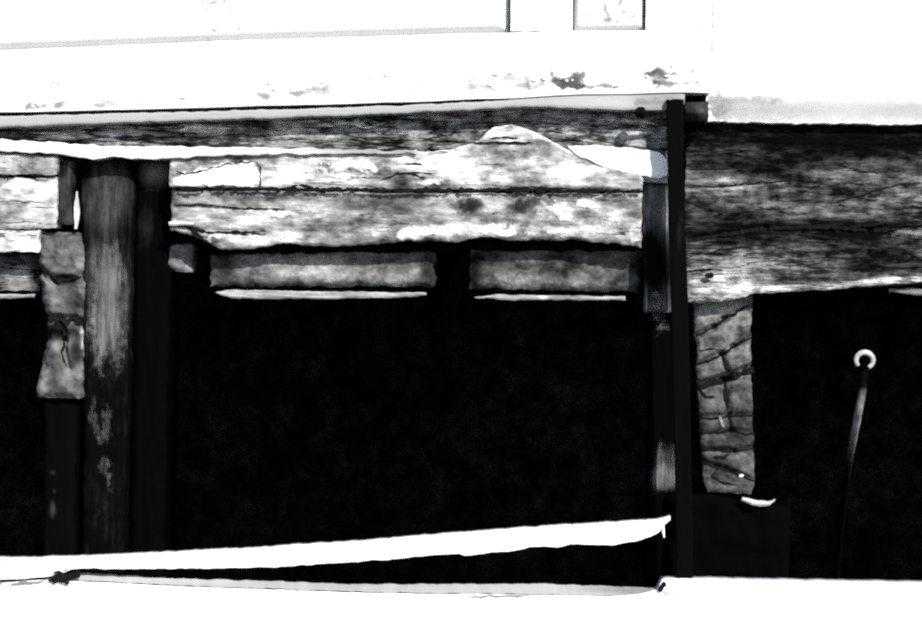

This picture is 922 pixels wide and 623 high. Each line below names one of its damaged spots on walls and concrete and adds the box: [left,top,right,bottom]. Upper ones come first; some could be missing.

peeling [645,64,674,85]